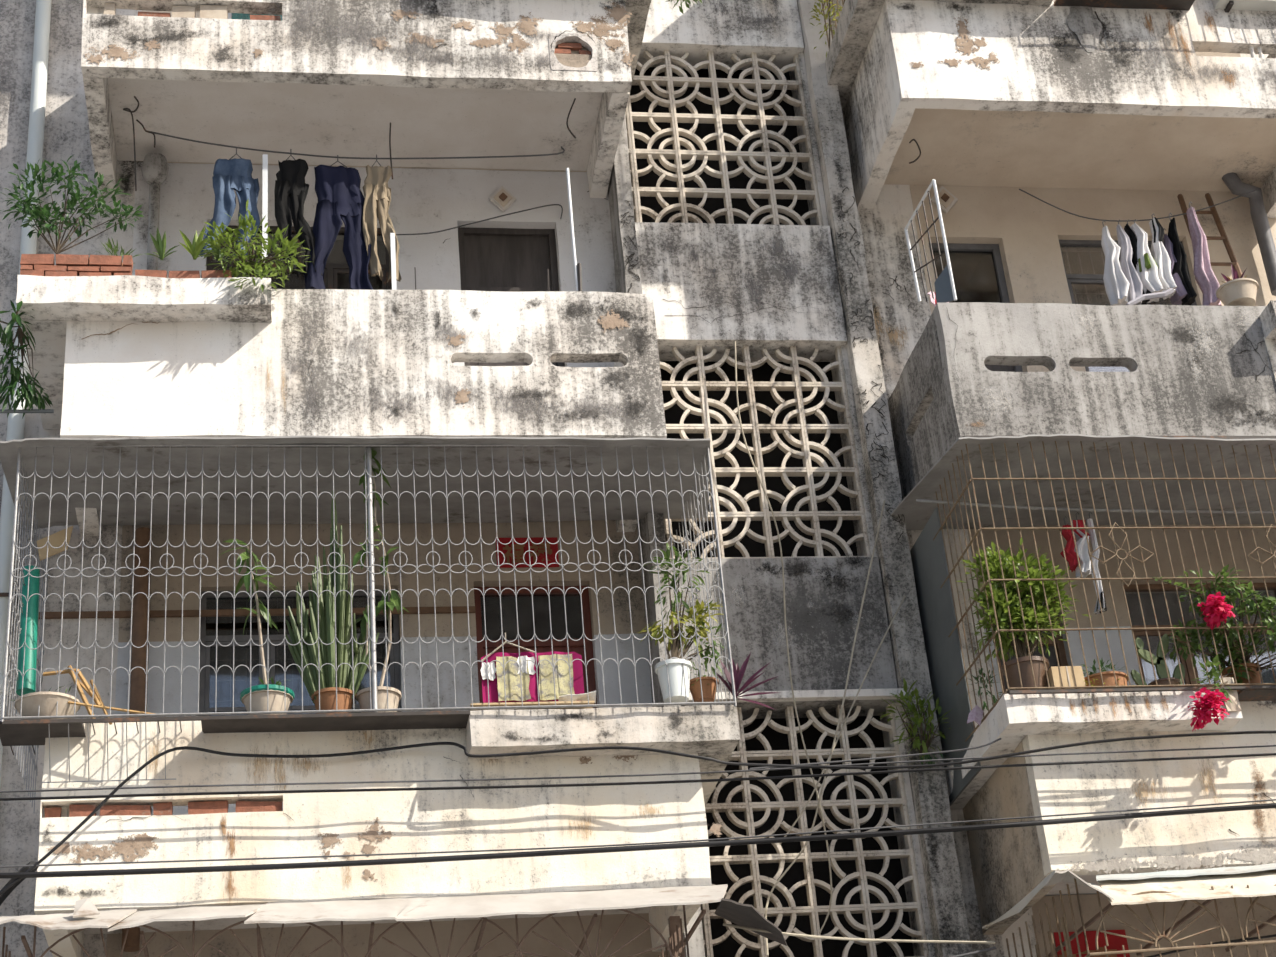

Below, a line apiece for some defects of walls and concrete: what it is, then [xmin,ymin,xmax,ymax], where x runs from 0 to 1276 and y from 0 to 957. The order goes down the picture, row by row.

spalling [367,0,637,71]
peeling [938,13,1000,70]
damp [1052,24,1082,64]
damp [1099,17,1244,80]
damp [436,314,465,348]
damp [557,300,651,357]
damp [1168,327,1213,378]
damp [364,380,484,418]
damp [500,370,650,422]
damp [1209,396,1276,427]
peeling [46,833,159,868]
peeling [317,817,393,860]